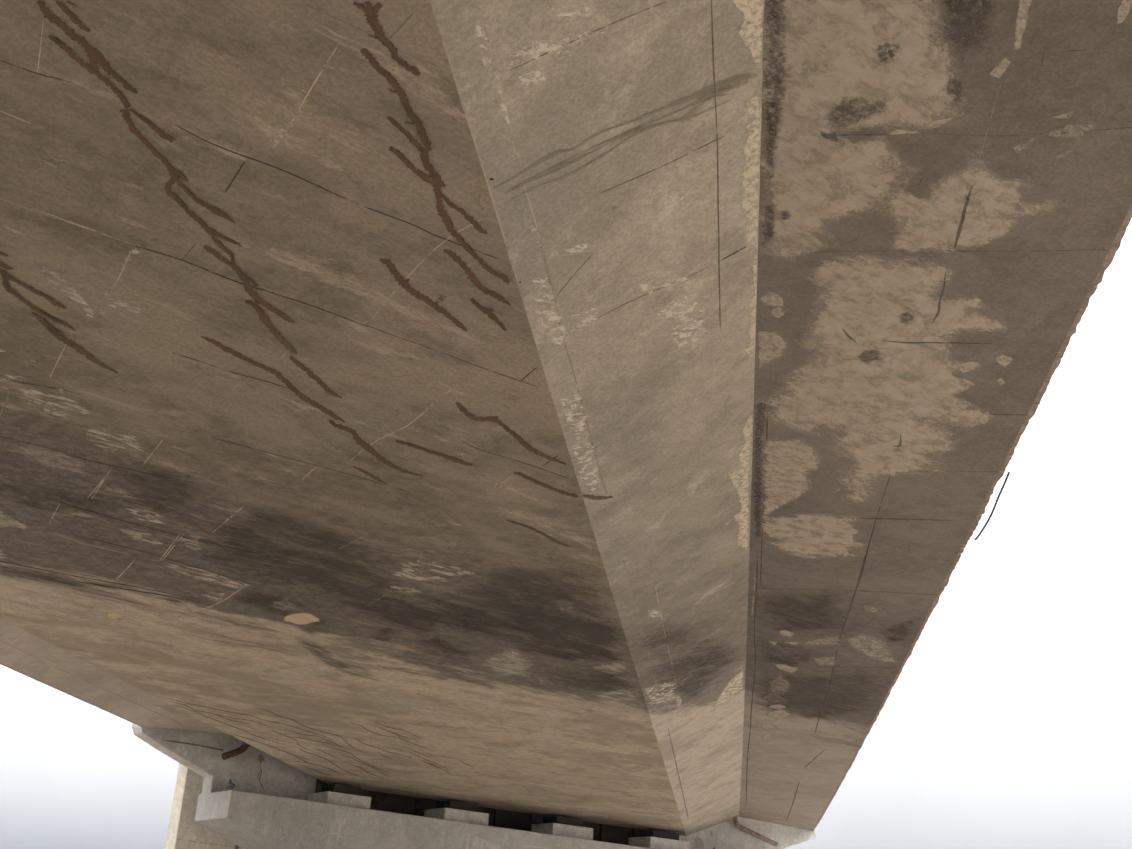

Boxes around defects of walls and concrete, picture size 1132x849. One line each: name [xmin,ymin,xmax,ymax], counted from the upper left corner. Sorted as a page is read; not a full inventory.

crack [353,1,511,331]
leakage [766,0,786,178]
leakage [821,98,883,141]
crack [36,0,472,484]
crack [0,251,118,374]
efflorescence [120,508,165,545]
crack [455,402,613,500]
leakage [753,403,765,536]
spalling [284,613,319,625]
leakage [166,515,682,717]
crack [169,698,476,790]
leakage [715,669,744,706]